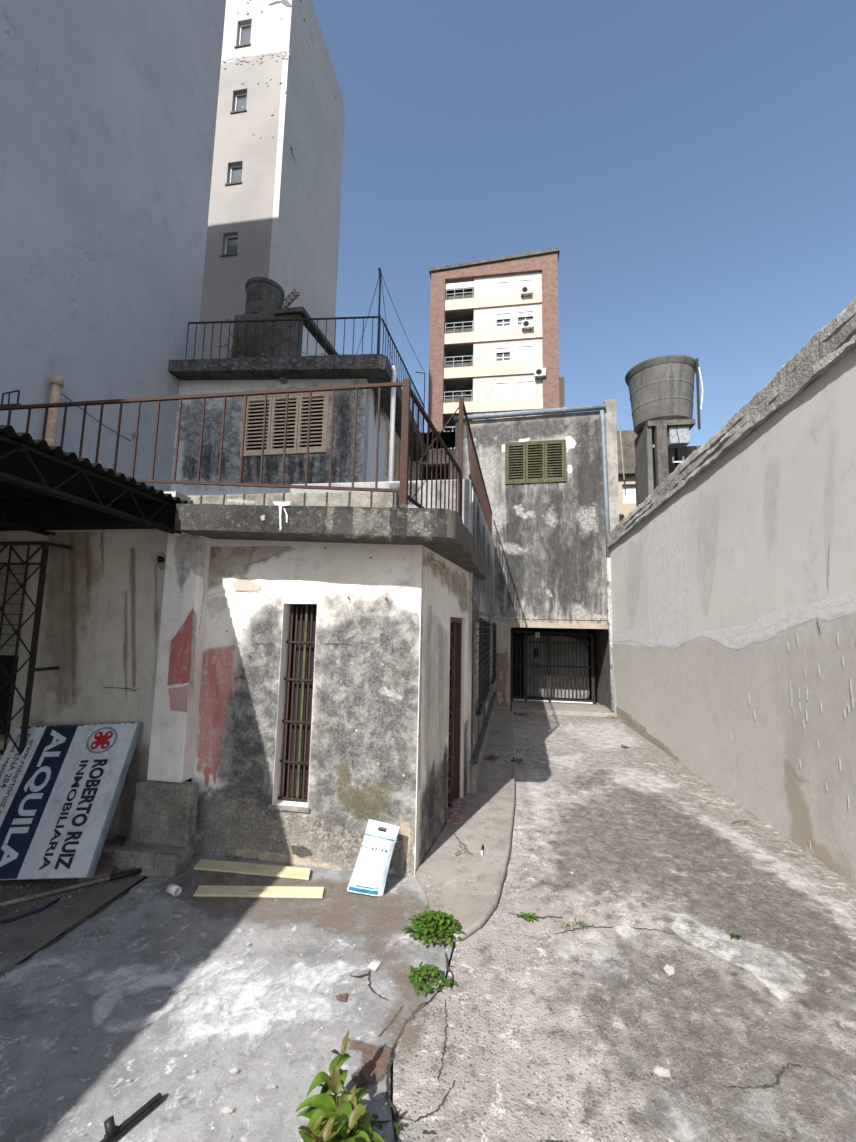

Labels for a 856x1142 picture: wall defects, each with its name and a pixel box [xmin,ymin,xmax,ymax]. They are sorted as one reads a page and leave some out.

water stain [205,599,289,817]
water stain [308,597,450,864]
water stain [423,417,607,797]